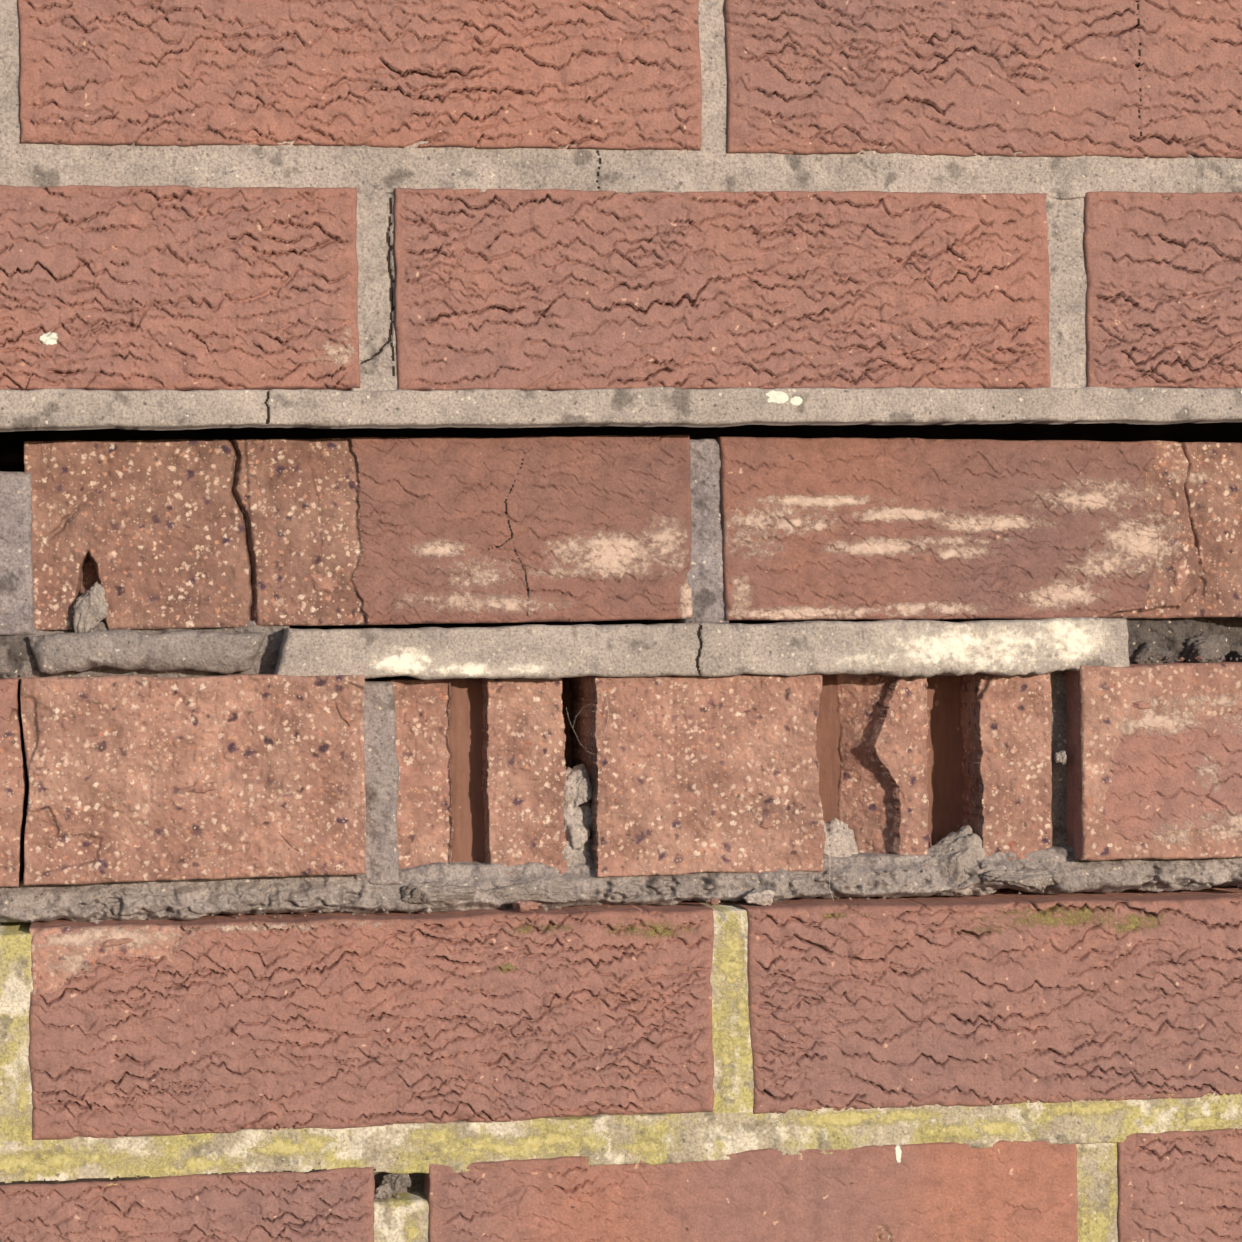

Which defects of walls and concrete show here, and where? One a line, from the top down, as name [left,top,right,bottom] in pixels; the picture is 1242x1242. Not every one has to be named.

spalling [24,437,369,631]
water stain [398,540,554,612]
water stain [532,516,693,619]
water stain [724,471,1212,671]
spalling [391,679,454,869]
spalling [481,674,930,877]
spalling [961,673,1052,861]
water stain [44,926,196,975]
water stain [217,922,319,933]